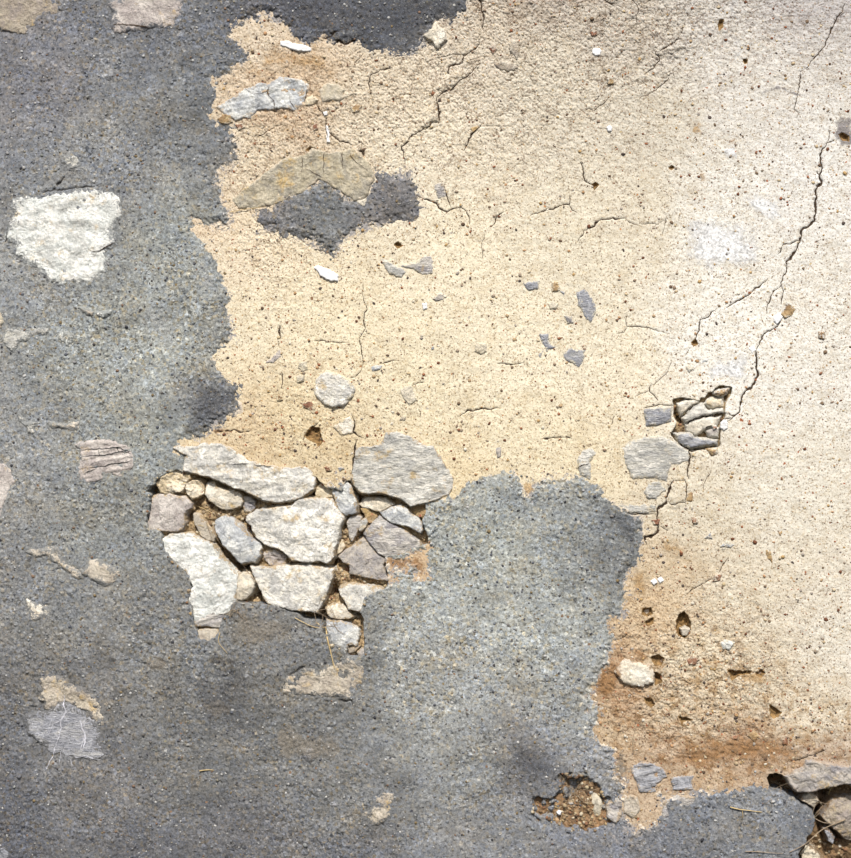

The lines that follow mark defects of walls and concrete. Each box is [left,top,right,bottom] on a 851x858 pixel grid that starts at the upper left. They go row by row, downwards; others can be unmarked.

crack [401,0,485,164]
crack [578,217,666,240]
crack [629,126,834,544]
spalling [304,426,323,447]
spalling [671,386,731,450]
spalling [181,491,300,571]
spalling [400,526,428,543]
spalling [305,558,388,655]
spalling [676,611,691,639]
spalling [651,654,664,686]
spalling [534,776,612,831]
spalling [807,784,851,858]